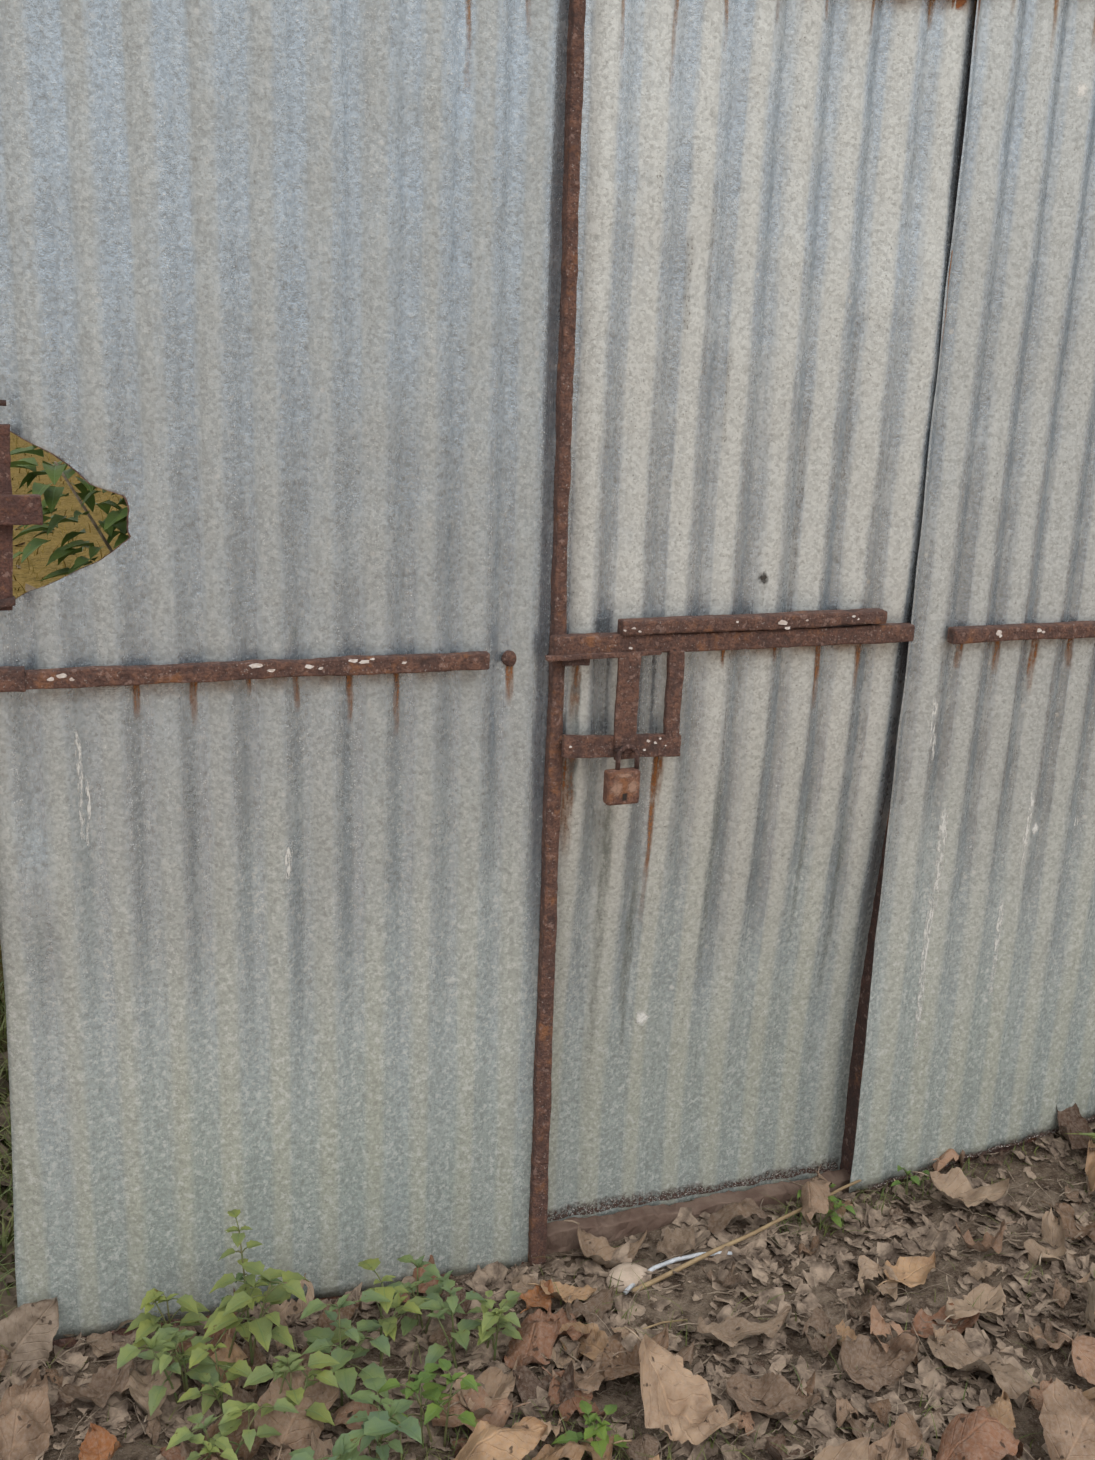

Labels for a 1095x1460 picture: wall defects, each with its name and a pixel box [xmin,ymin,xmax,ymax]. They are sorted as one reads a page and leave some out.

rust [571,666,580,702]